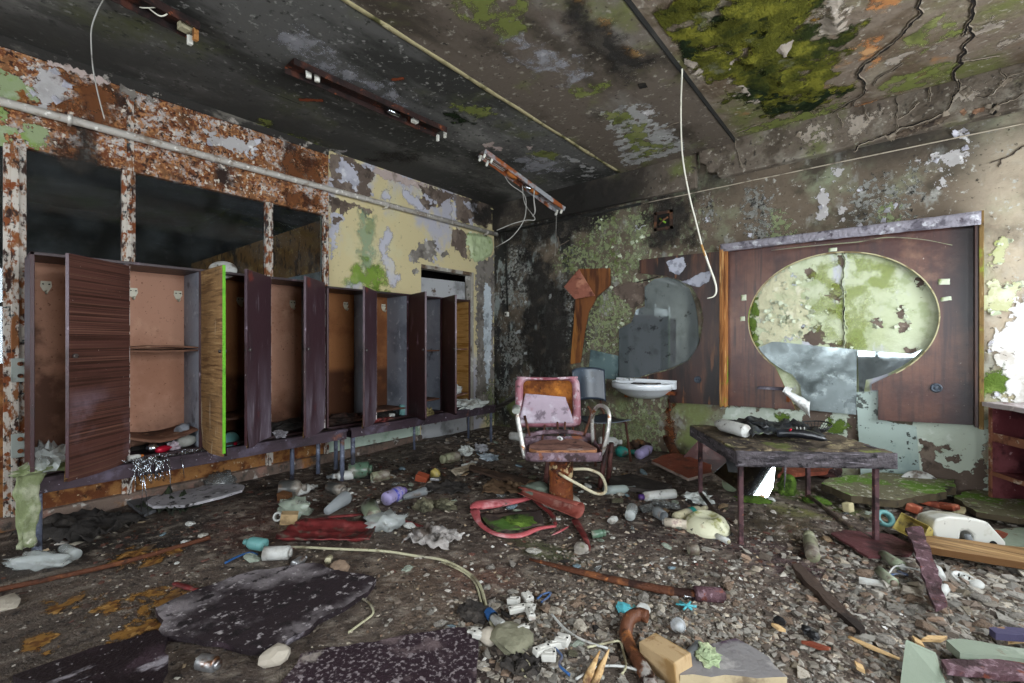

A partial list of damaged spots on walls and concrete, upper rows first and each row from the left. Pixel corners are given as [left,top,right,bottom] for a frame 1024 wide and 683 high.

peeling [49,67,74,105]
rust [48,71,121,173]
water stain [515,37,588,83]
crack [832,0,1024,152]
rust [278,150,327,210]
peeling [328,154,537,426]
water stain [470,199,613,377]
flaking render [987,281,1024,403]
flaking render [918,438,988,496]